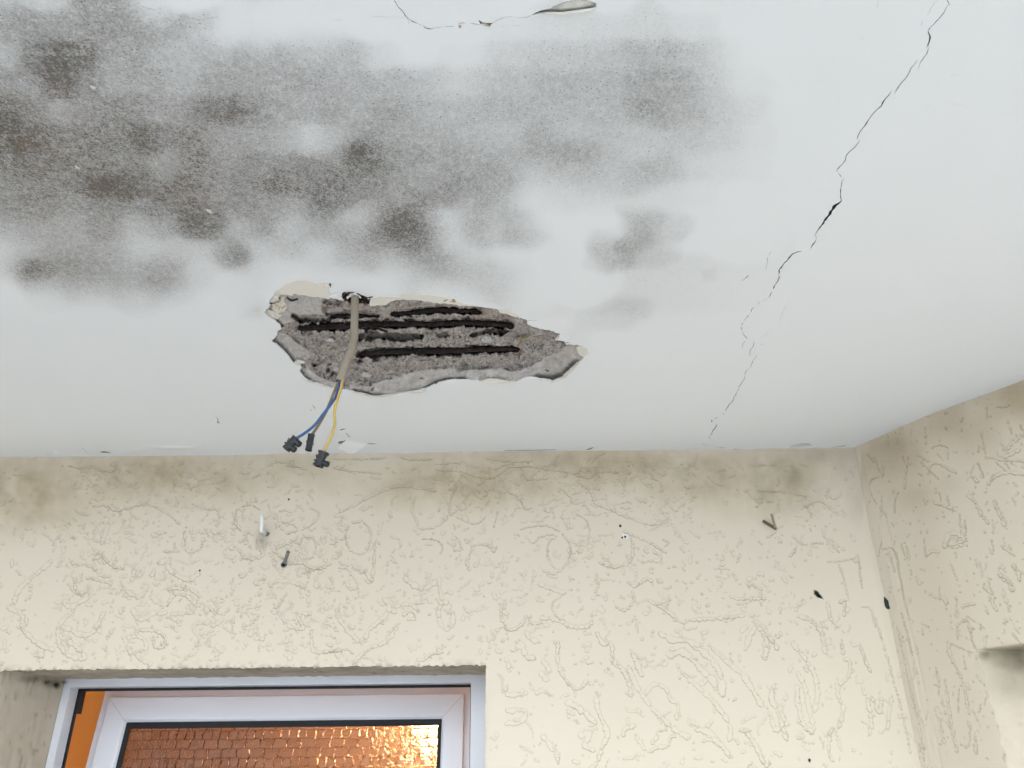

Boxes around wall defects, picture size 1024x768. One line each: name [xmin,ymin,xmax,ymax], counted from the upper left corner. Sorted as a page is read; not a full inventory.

mould [0,0,724,303]
spalling [265,280,588,397]
crack [711,0,949,449]